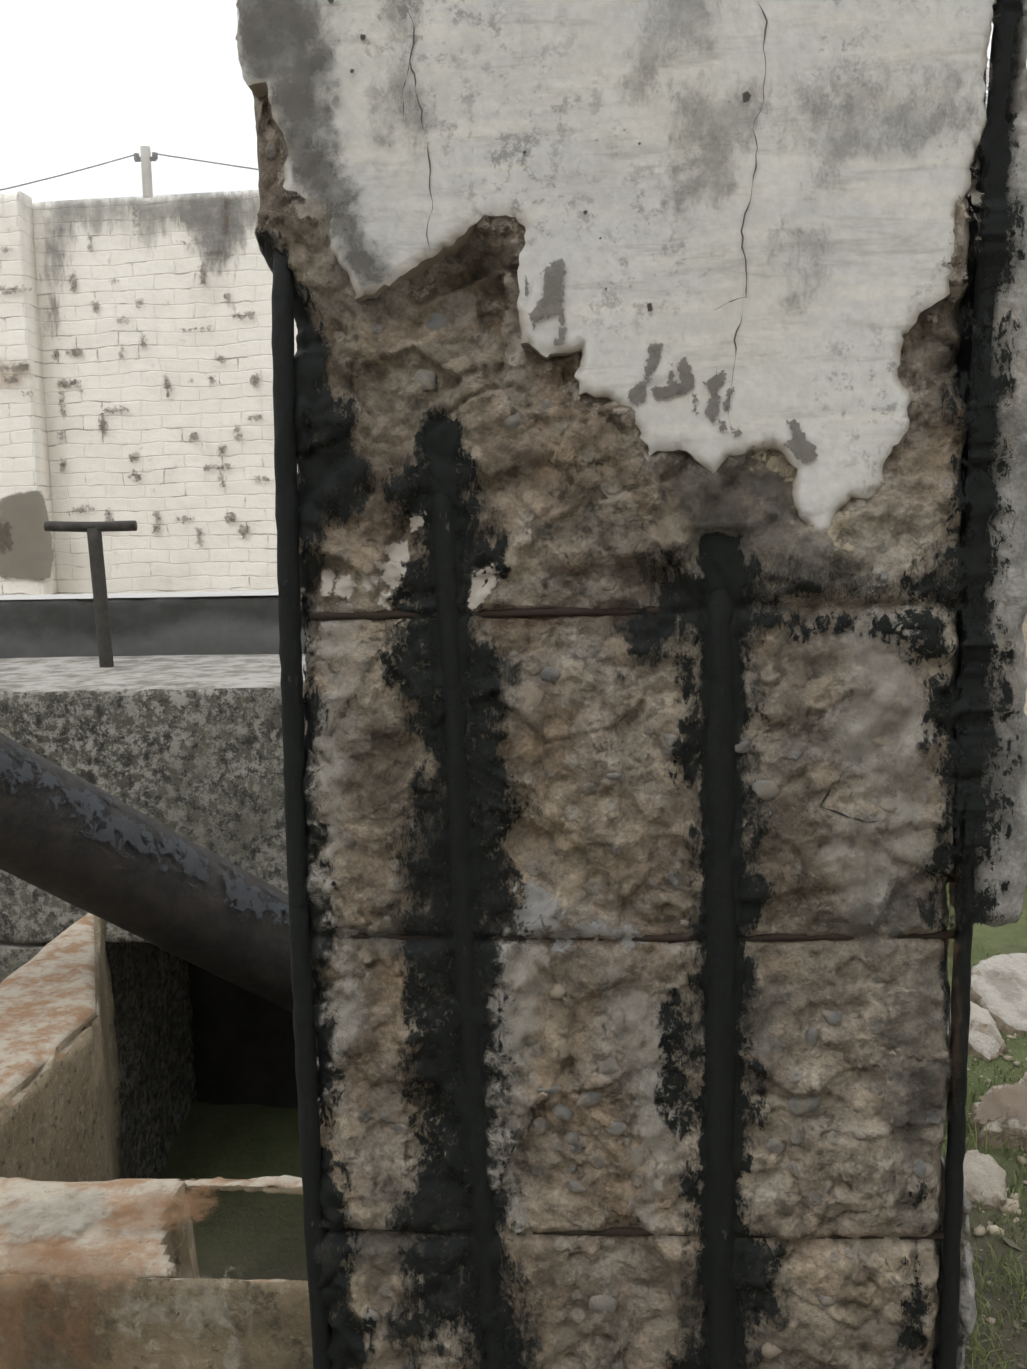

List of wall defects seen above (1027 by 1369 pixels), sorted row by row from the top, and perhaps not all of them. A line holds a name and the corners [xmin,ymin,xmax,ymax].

crack [402,4,433,250]
crack [713,3,768,439]
spalling [986,0,1014,130]
spalling [0,491,55,581]
peeling [0,740,211,888]
spalling [222,92,995,1369]